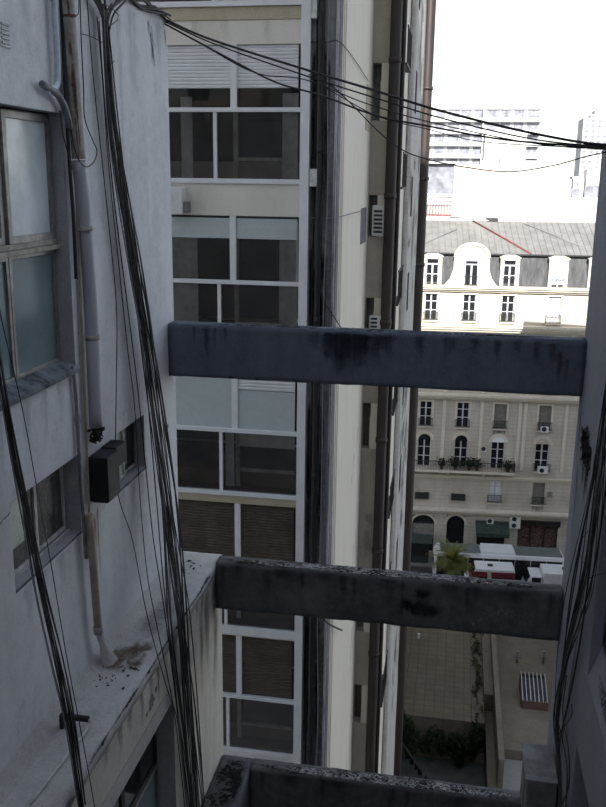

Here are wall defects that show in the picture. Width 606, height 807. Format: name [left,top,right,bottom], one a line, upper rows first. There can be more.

rust [72,69,80,162]